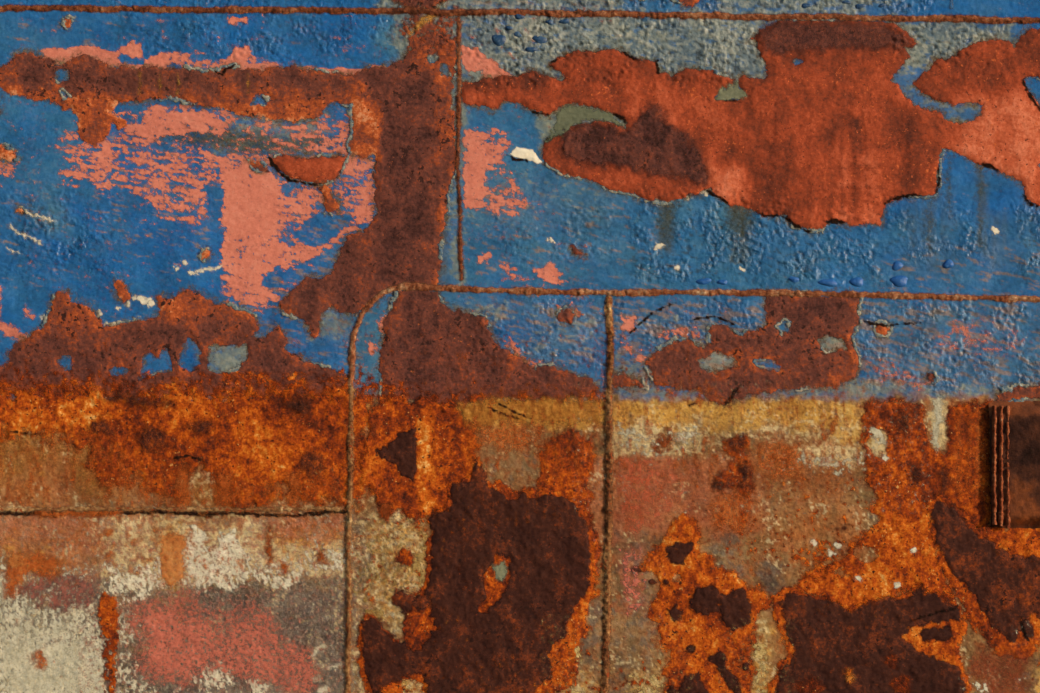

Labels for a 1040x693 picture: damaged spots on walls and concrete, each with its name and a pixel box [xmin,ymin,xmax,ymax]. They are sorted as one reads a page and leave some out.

corrosion [670,0,700,8]
peeling [41,40,279,72]
peeling [298,65,386,75]
peeling [461,18,1040,233]
peeling [55,104,377,313]
peeling [478,252,568,286]
peeling [97,295,155,326]
corrosion [0,0,606,693]
peeling [620,313,647,362]
peeling [658,326,700,342]
peeling [792,427,886,476]
corrosion [615,383,1040,693]